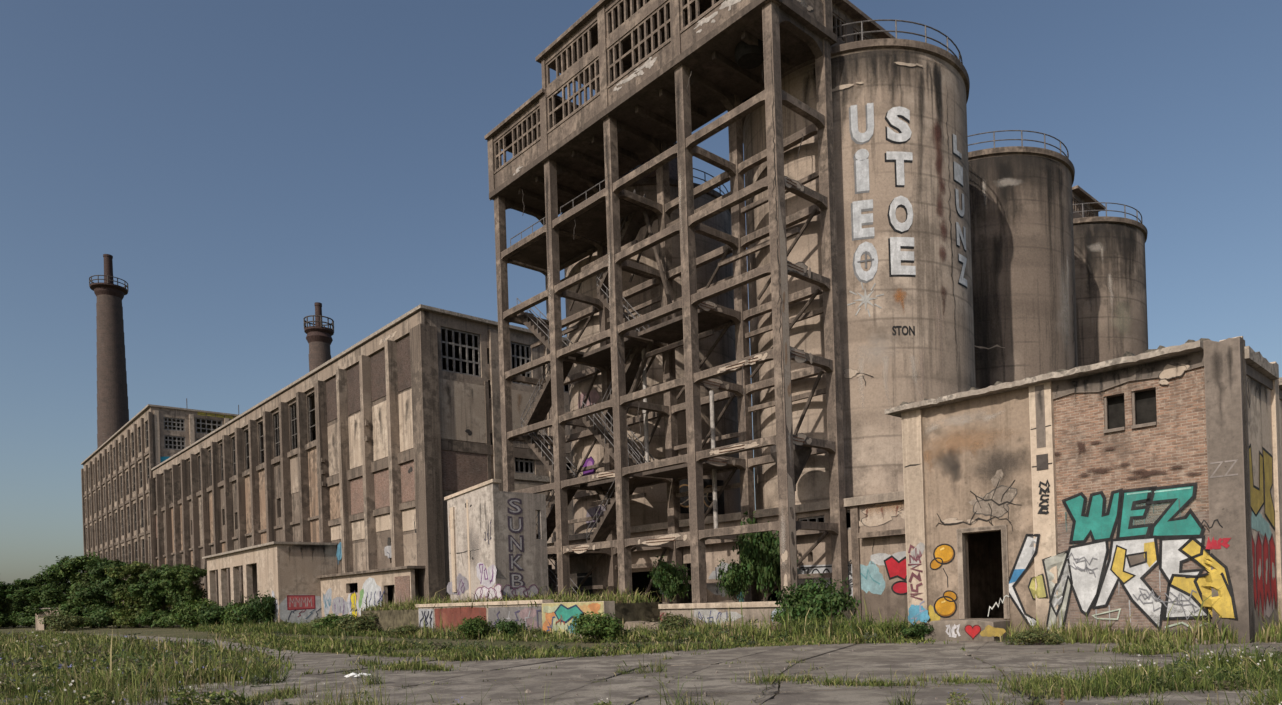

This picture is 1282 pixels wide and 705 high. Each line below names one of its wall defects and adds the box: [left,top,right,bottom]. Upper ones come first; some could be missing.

damp [805,50,941,121]
rust [935,125,946,259]
damp [968,155,1062,212]
damp [1076,223,1135,283]
damp [973,290,995,389]
crack [936,463,1052,531]